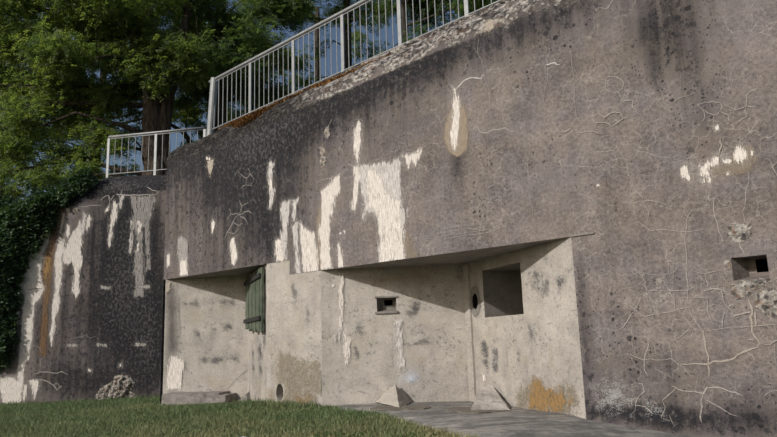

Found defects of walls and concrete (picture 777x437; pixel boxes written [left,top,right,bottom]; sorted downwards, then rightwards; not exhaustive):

crack [450,40,501,93]
crack [660,89,756,124]
crack [471,50,668,219]
crack [224,171,253,239]
spalling [727,222,752,243]
crack [597,190,777,425]
spalling [730,278,777,316]
spalling [96,375,135,400]
rust [511,375,578,414]